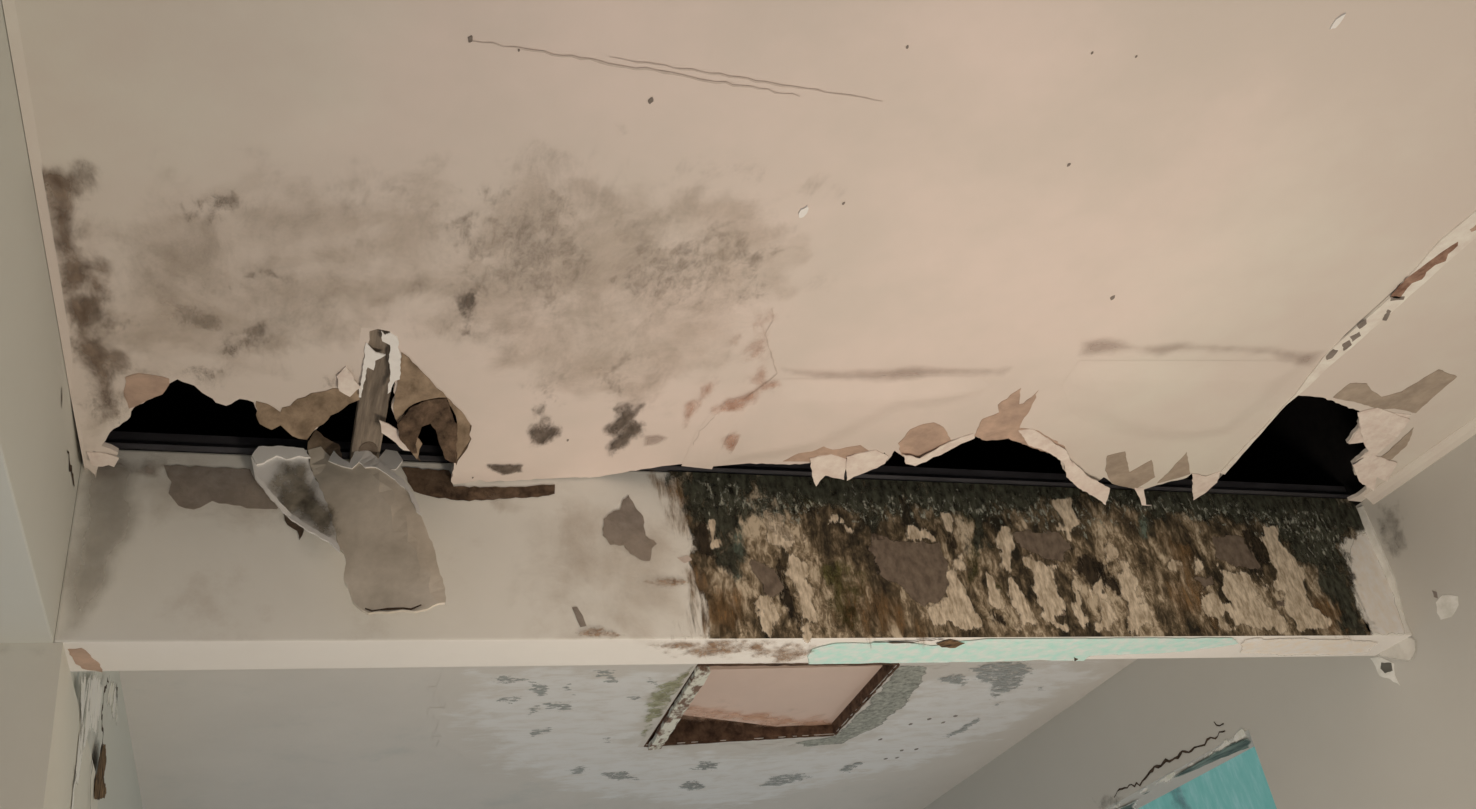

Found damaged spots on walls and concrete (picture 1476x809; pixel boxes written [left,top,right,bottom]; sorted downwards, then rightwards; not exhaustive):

mould [42,172,124,406]
water stain [460,294,474,314]
peeling [337,331,401,398]
peeling [144,465,304,540]
peeling [378,398,555,501]
mould [530,411,560,445]
mould [606,405,662,450]
peeling [810,433,975,486]
peeling [1018,429,1220,506]
peeling [1333,369,1457,491]
water stain [656,471,1404,643]
water stain [427,659,1123,809]